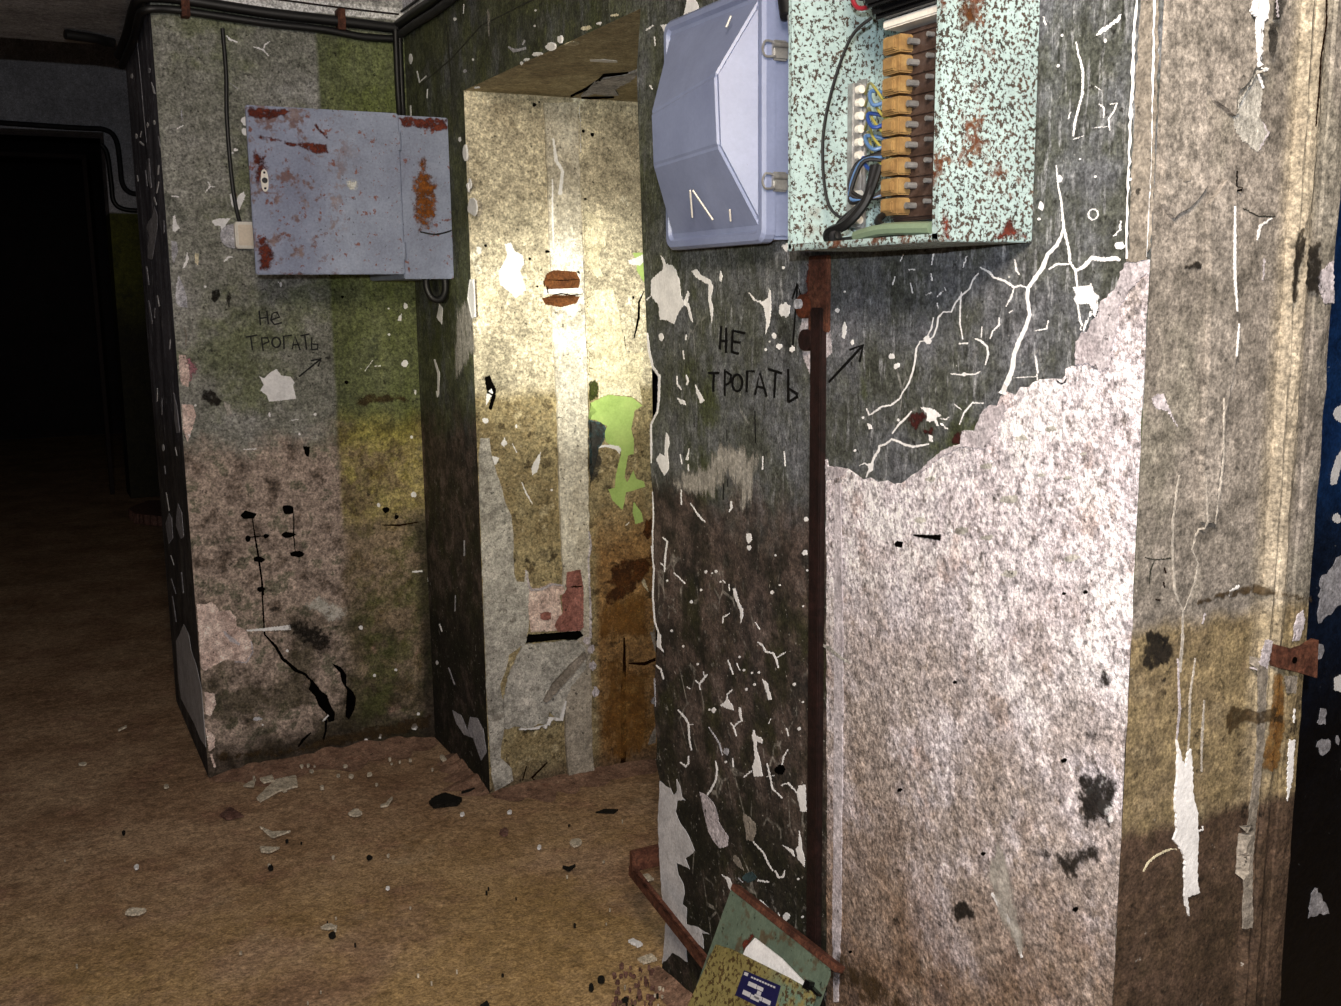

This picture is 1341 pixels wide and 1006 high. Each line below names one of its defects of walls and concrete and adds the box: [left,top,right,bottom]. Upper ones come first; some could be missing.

crack [859,41,1121,478]
crack [240,505,356,747]
flaking render [452,375,600,791]
peeling [466,138,786,707]
peeling [658,656,807,963]
flaking render [825,0,1178,1006]
flaking render [1172,739,1204,916]
peeling [1235,639,1298,929]
peeling [1292,556,1341,641]
peeling [1308,888,1329,918]
peeling [1316,708,1340,756]
peeling [1330,452,1341,485]